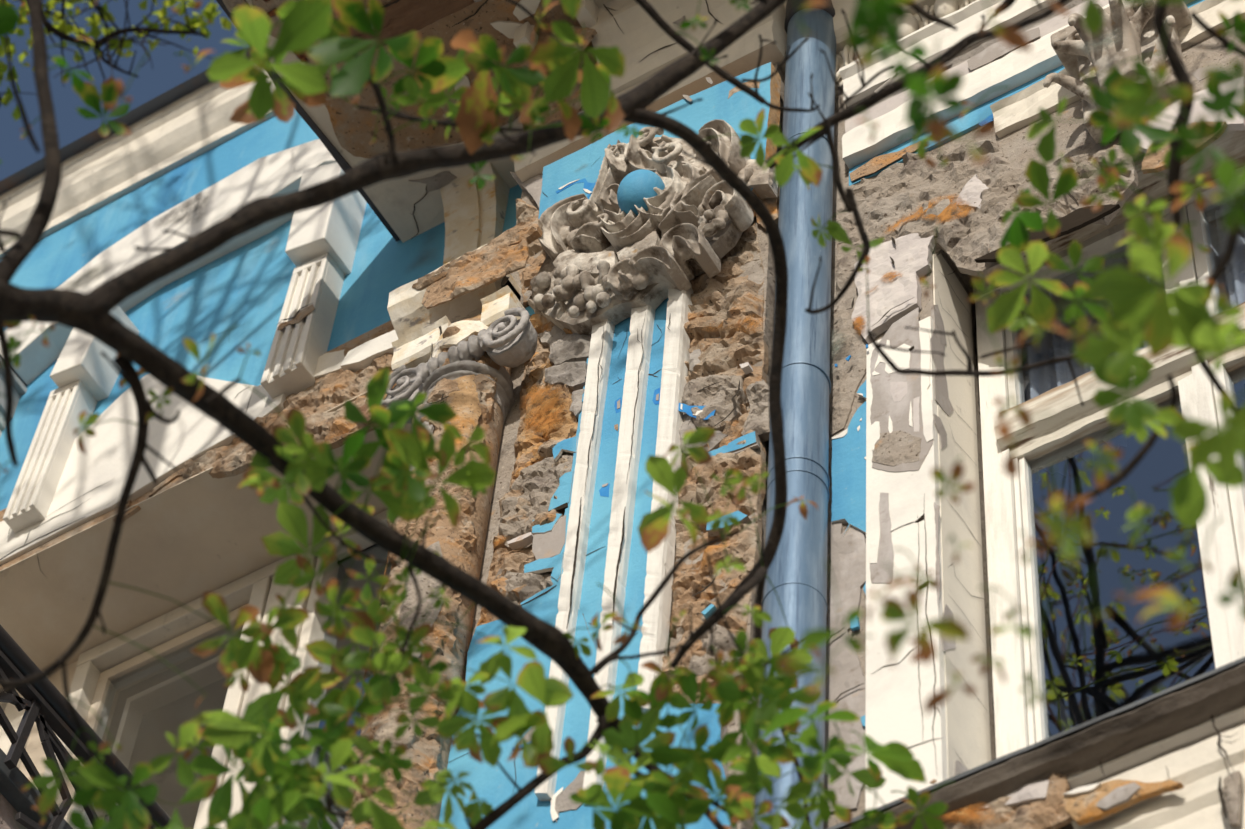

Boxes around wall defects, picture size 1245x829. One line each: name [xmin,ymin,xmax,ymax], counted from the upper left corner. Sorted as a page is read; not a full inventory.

flaking render [252,0,298,38]
flaking render [304,0,597,159]
flaking render [728,82,760,99]
crack [410,181,427,239]
flaking render [408,171,597,607]
peeling [614,397,622,431]
crack [520,313,671,634]
peeling [599,483,610,497]
flaking render [662,194,779,704]
flaking render [824,114,1175,814]
flaking render [477,608,498,626]
flaking render [943,770,1184,829]